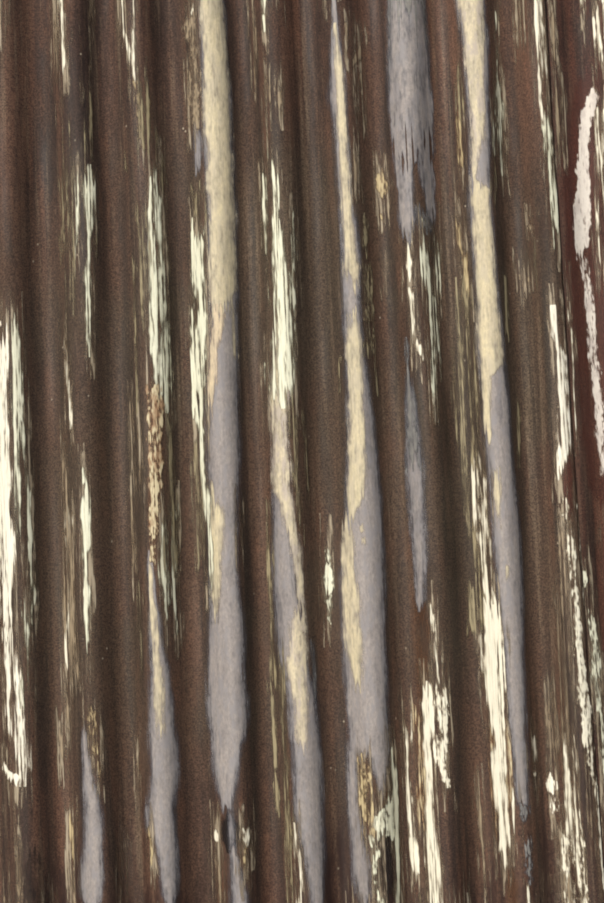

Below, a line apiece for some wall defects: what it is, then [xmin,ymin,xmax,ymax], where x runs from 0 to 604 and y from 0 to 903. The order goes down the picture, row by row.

peeling [0,292,39,903]
peeling [49,0,70,96]
peeling [55,81,105,903]
peeling [117,0,250,903]
peeling [243,0,325,903]
rust [380,831,393,903]
peeling [320,0,471,903]
rust [429,580,450,694]
peeling [451,0,604,903]
rust [556,458,572,509]
rust [565,67,604,502]